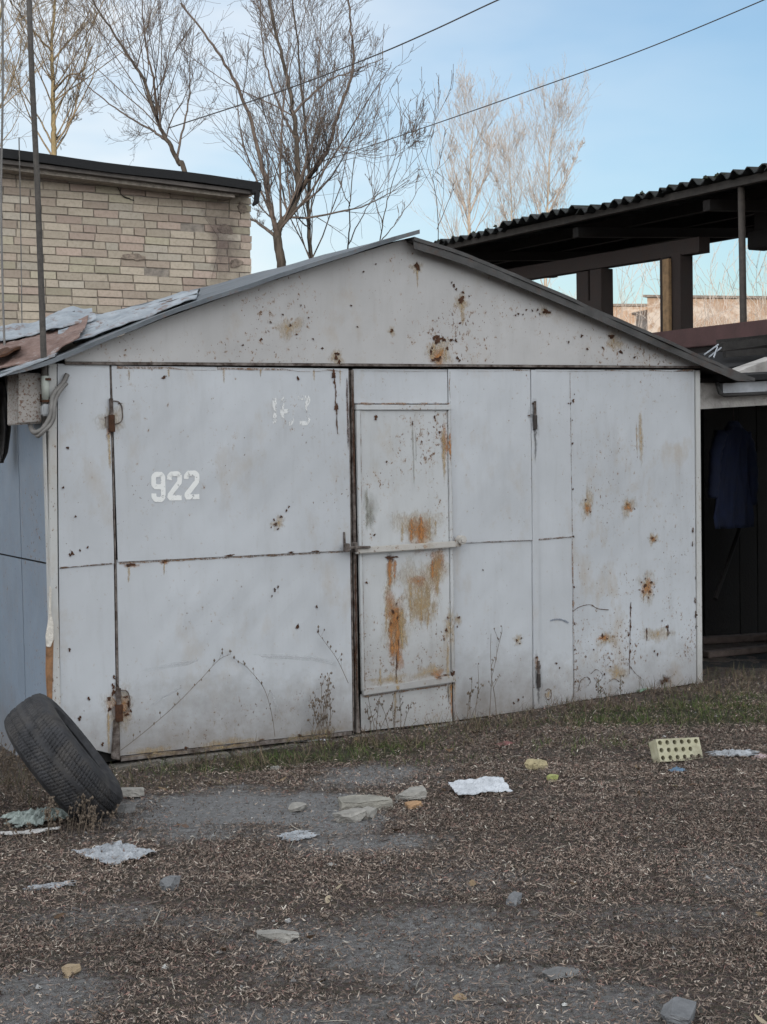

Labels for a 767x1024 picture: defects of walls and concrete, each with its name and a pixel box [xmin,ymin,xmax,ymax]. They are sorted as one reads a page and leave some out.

corrosion [430,335,461,364]
corrosion [303,338,449,498]
corrosion [401,517,436,543]
corrosion [352,553,455,713]
corrosion [107,675,132,743]